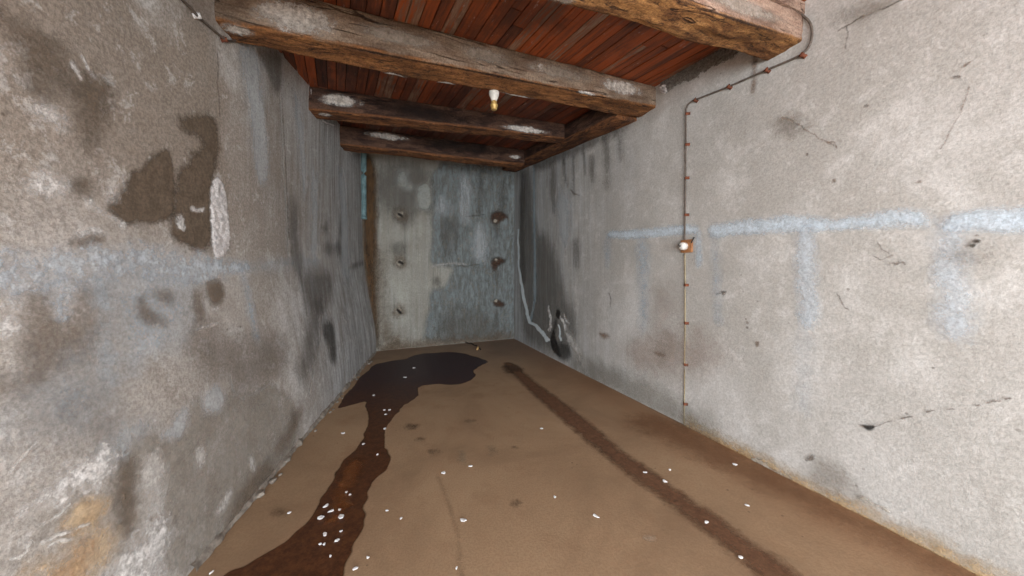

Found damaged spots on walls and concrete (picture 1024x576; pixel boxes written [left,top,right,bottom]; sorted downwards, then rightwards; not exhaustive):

water stain [108,114,220,253]
water stain [242,48,267,180]
water stain [197,281,224,315]
water stain [224,163,582,576]
water stain [505,362,794,576]
crack [863,410,934,431]